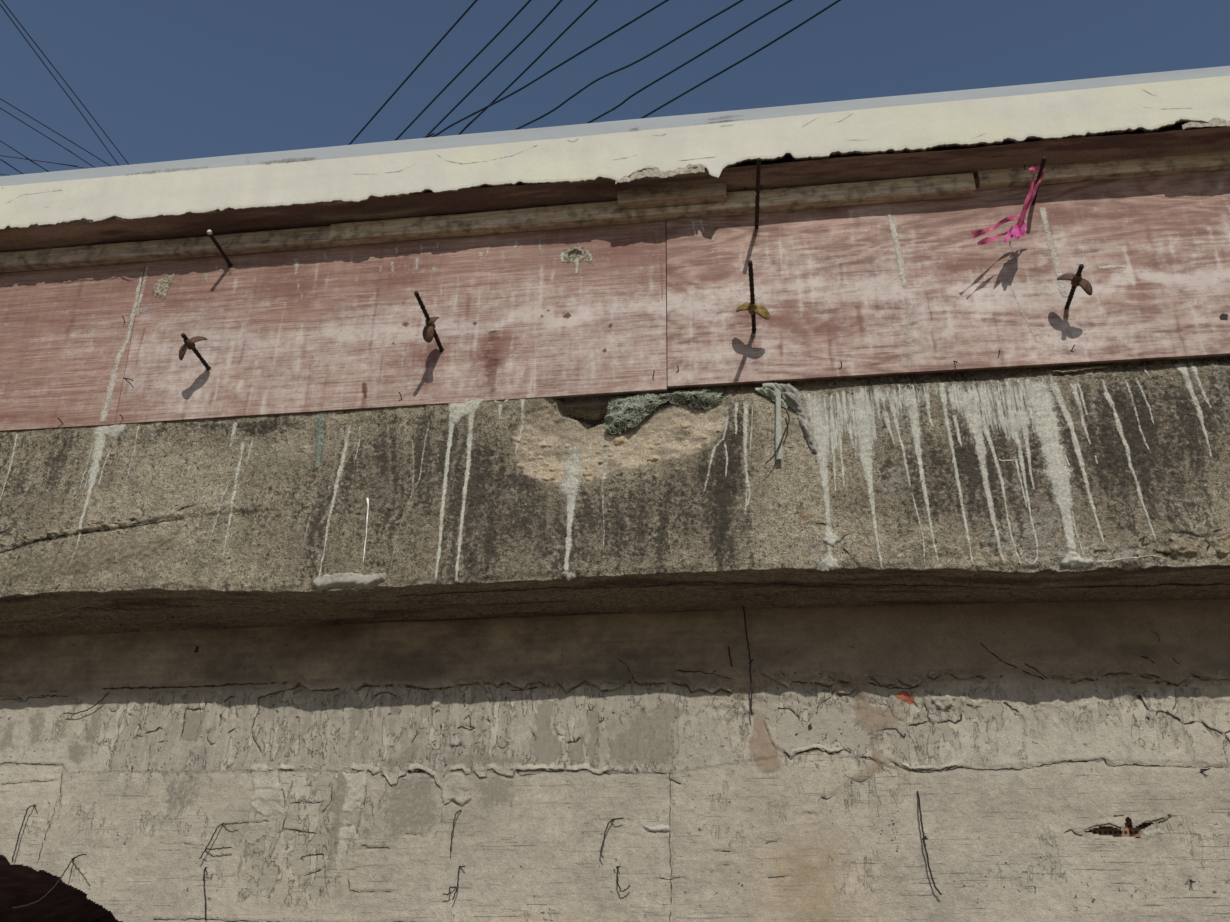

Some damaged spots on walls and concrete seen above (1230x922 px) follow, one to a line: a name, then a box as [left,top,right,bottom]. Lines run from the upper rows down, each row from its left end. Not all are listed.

crack [0,505,193,553]
damp [70,268,149,562]
damp [355,402,755,597]
spalling [509,396,731,498]
damp [770,363,1218,587]
crack [2,762,62,863]
flaking render [249,701,608,870]
crack [604,772,681,919]
flaking render [764,689,849,760]
flaking render [860,668,988,712]
crack [808,694,1230,814]
crack [154,914,281,922]